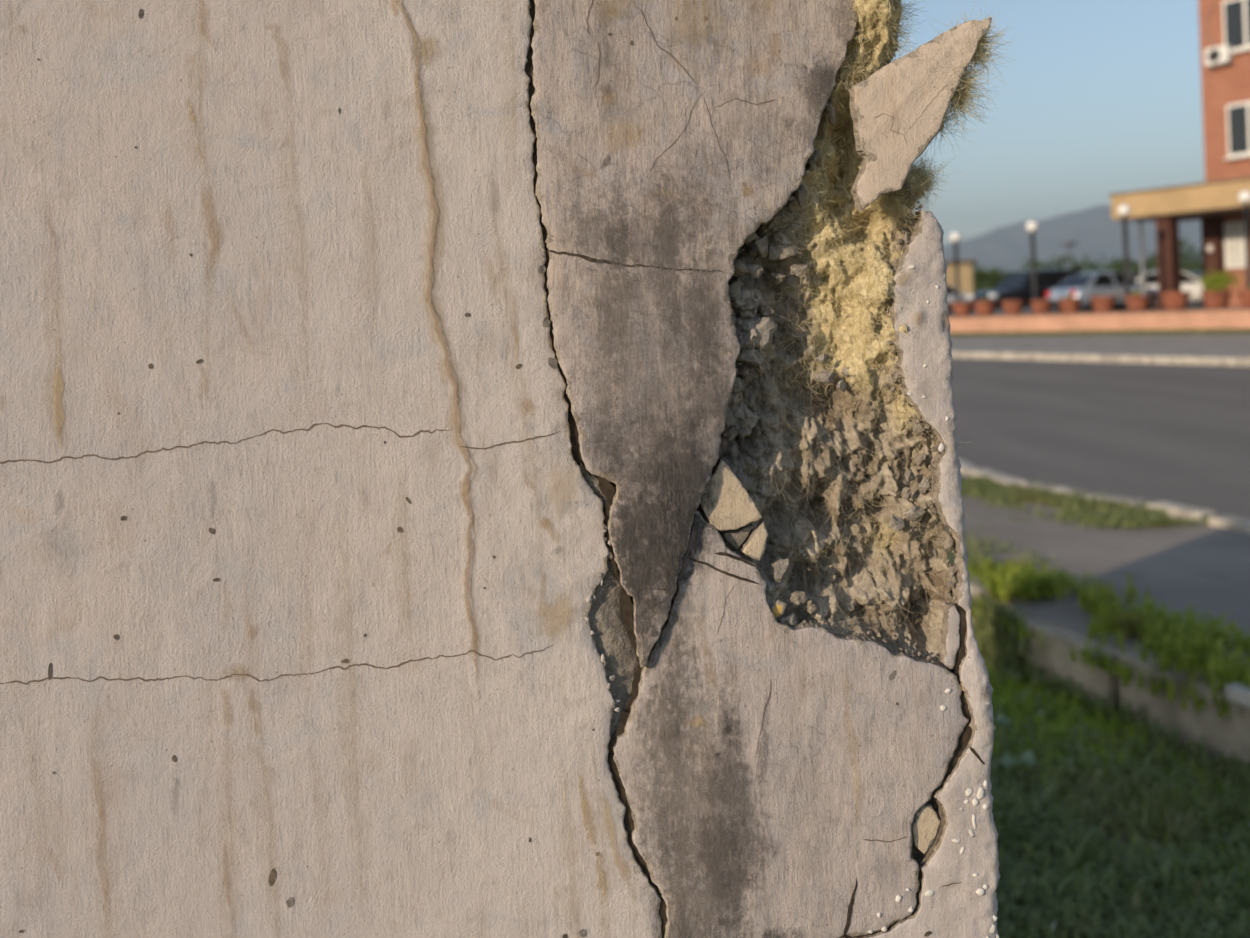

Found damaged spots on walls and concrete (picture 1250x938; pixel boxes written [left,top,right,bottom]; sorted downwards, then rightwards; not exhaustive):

crack [0,0,774,938]
water stain [595,253,728,654]
flaking render [699,0,1024,674]
crack [840,603,984,938]